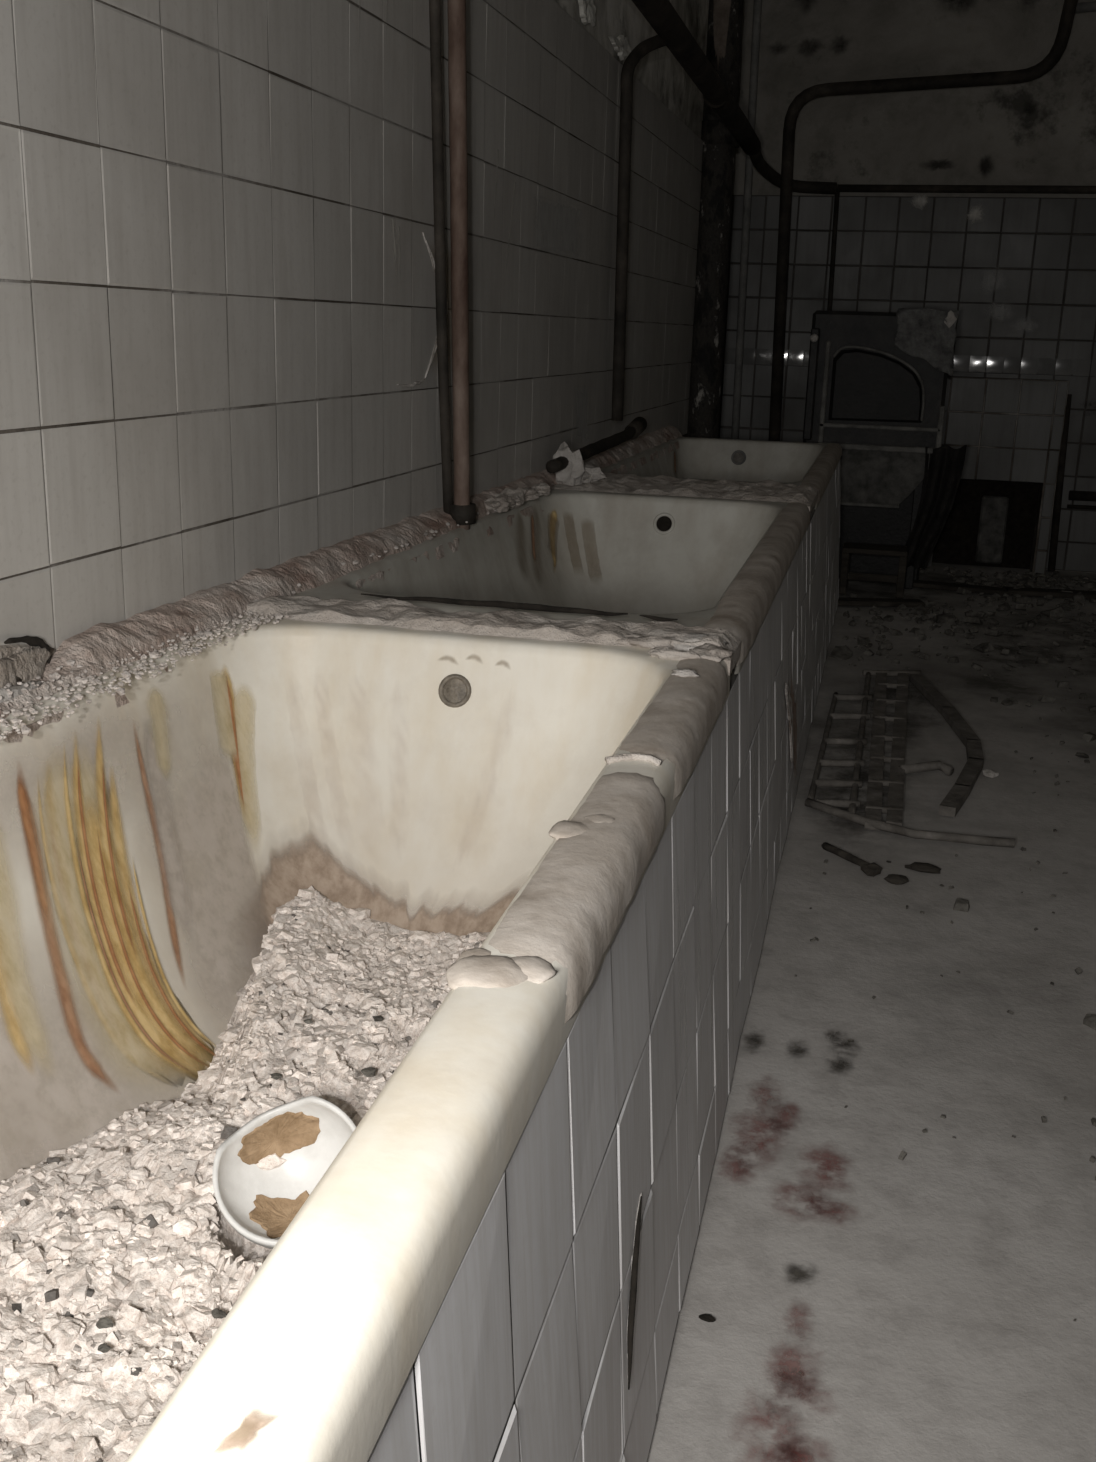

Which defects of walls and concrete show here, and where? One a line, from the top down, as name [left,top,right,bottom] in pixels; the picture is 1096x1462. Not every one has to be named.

spalling [0,636,54,703]
rust [213,672,257,833]
rust [18,693,215,1082]
peeling [216,1413,272,1451]